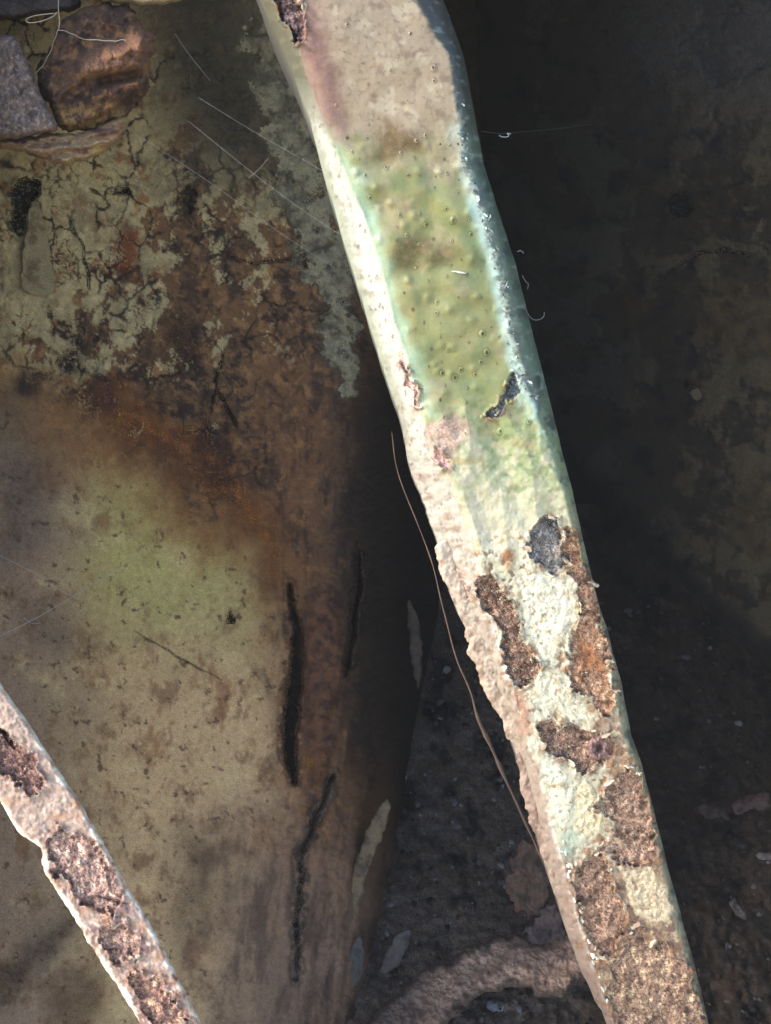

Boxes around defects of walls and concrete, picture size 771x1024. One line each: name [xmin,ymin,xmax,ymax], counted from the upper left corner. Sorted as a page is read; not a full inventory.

crack [67,216,91,290]
crack [230,254,311,287]
peeling [472,182,539,400]
rust [190,420,236,484]
crack [206,342,238,434]
crack [340,542,367,682]
crack [277,578,340,982]
peeling [518,515,708,1024]
rust [0,683,201,1024]
rust [366,926,586,1024]